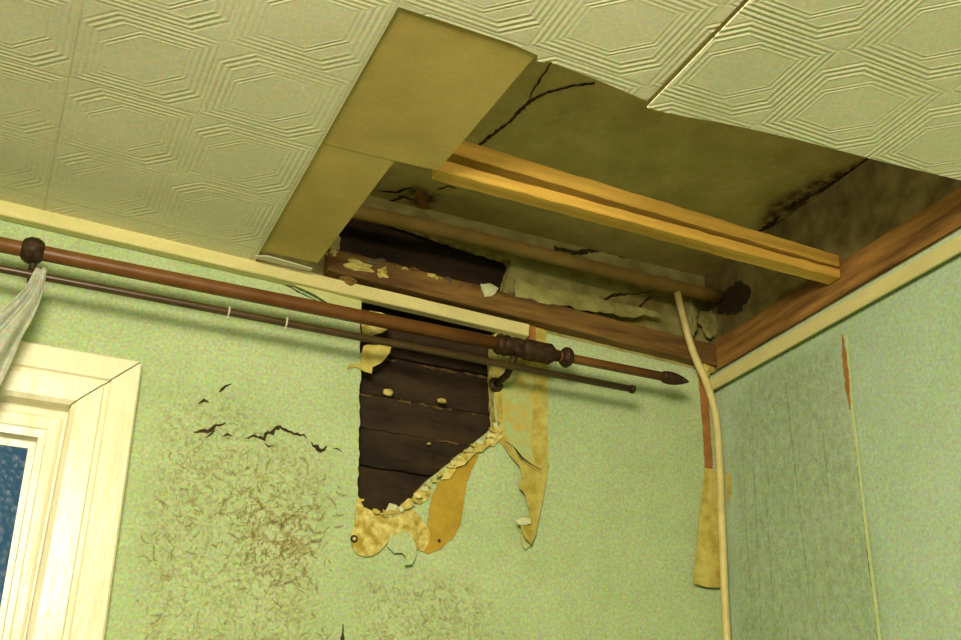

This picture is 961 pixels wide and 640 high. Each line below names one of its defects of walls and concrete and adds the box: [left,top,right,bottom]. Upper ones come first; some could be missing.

crack [478,63,595,146]
crack [758,158,868,232]
flaking render [325,235,661,318]
flaking render [680,280,751,339]
flaking render [347,324,391,373]
crack [198,384,231,404]
crack [193,423,342,453]
flaking render [350,418,503,565]